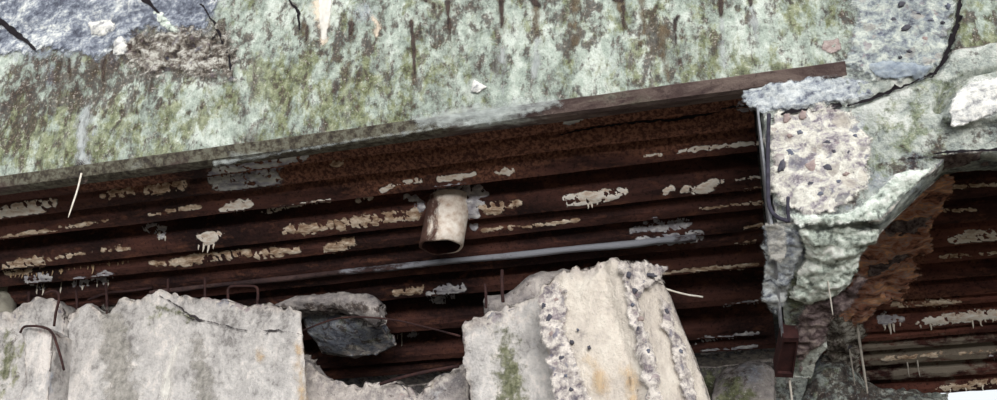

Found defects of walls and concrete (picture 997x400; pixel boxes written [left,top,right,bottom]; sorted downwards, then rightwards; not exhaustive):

crack [0,18,36,50]
crack [289,0,301,30]
leakage [302,0,332,44]
crack [771,0,963,119]
leakage [416,98,559,131]
leakage [677,141,759,154]
leakage [207,155,331,214]
spalling [743,0,956,382]
corrosion [834,151,990,328]
crack [159,295,301,335]
spalling [538,282,592,400]
spalling [618,260,668,400]